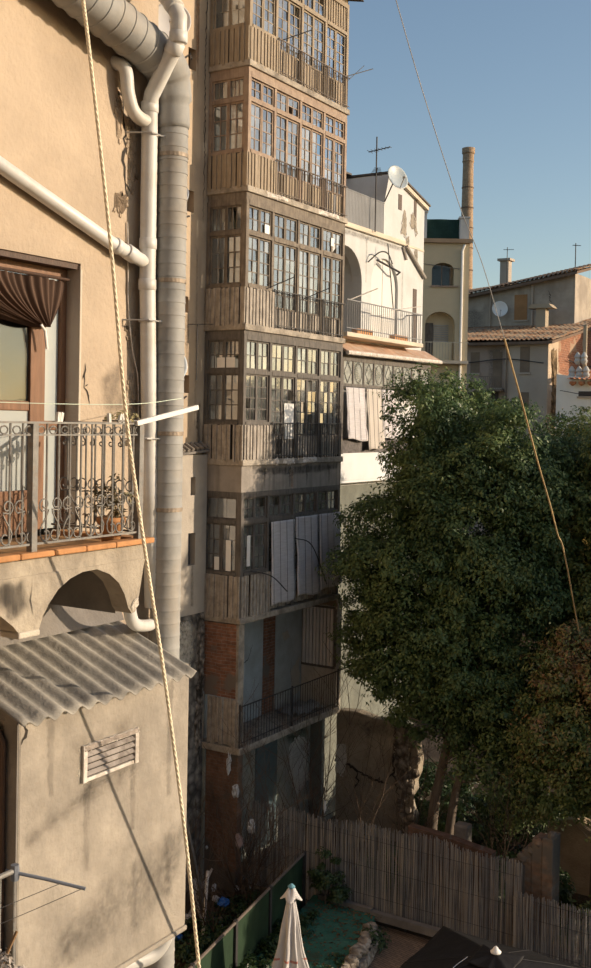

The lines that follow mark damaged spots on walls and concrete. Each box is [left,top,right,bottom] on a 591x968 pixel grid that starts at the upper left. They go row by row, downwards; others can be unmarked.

spalling [112,91,138,218]
crack [346,729,399,795]